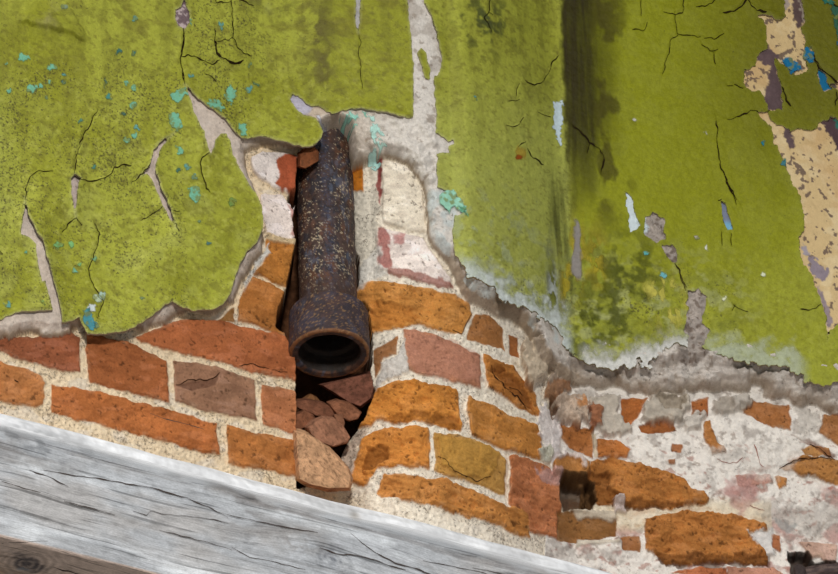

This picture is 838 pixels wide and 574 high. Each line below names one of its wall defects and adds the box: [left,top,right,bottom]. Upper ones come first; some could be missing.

crack [74,110,151,182]
crack [180,0,254,84]
spalling [552,100,563,146]
damp [561,0,596,163]
crack [662,0,767,74]
crack [715,110,757,202]
peeling [744,0,838,335]
spalling [626,193,677,263]
spalling [0,0,561,556]
damp [465,264,569,349]
efflorescence [584,337,688,370]
spalling [546,289,838,574]